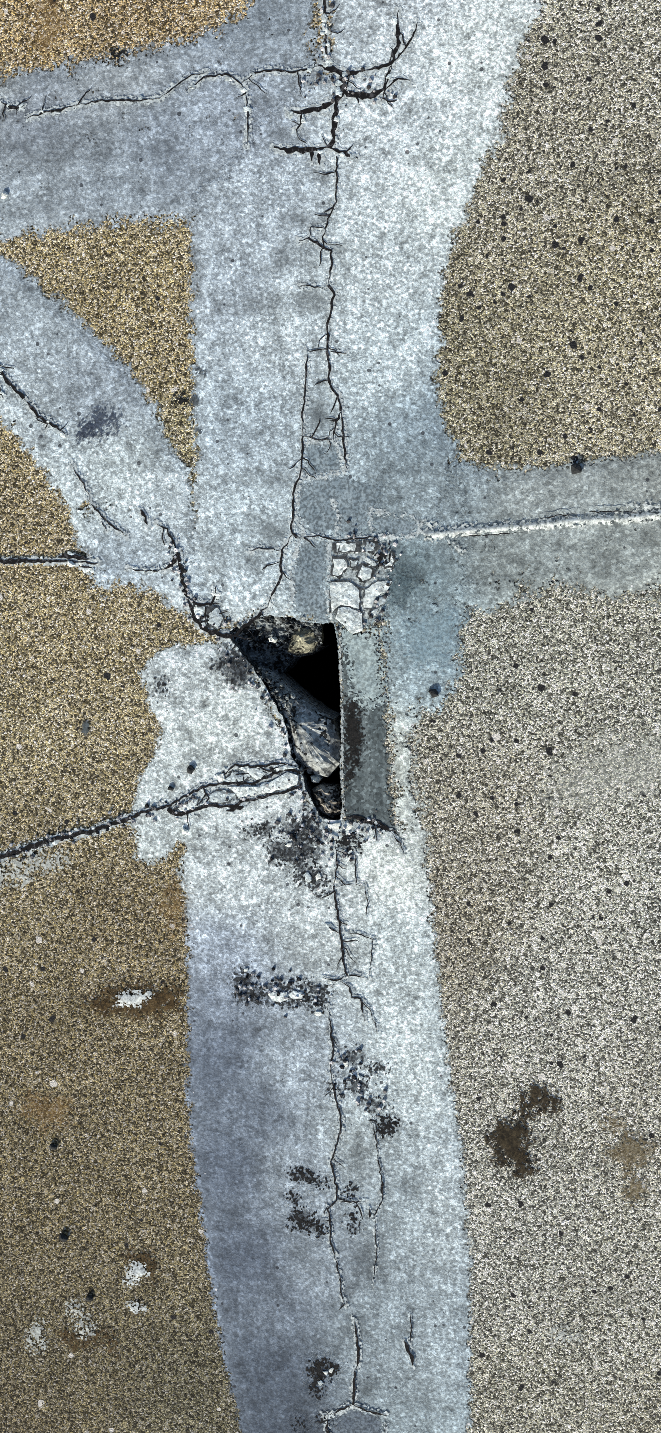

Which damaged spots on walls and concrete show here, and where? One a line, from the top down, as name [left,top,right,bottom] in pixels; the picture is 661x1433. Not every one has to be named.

crack [0,0,422,642]
crack [0,759,311,863]
peeling [208,437,423,898]
crack [320,821,406,1433]
crack [401,1313,416,1370]
water stain [481,1080,564,1182]